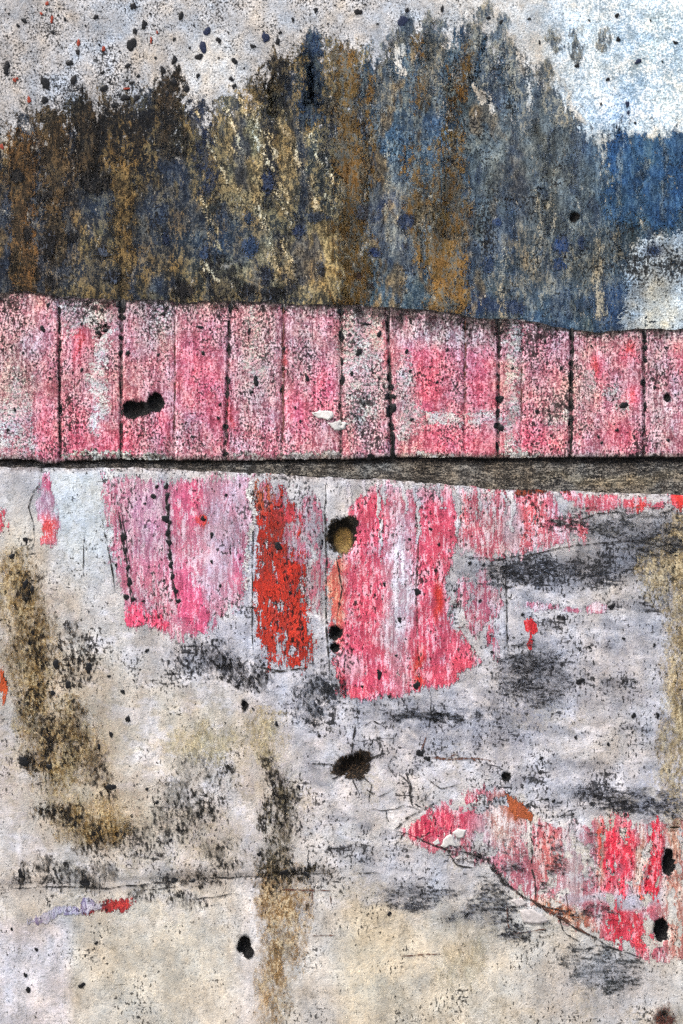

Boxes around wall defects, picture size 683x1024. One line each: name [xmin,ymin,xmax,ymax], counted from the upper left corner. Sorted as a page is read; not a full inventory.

water stain [0,26,683,349]
water stain [8,564,118,801]
water stain [13,674,347,911]
rust [253,850,314,1023]
peeling [100,469,683,703]
crack [356,491,678,958]
peeling [399,783,683,966]